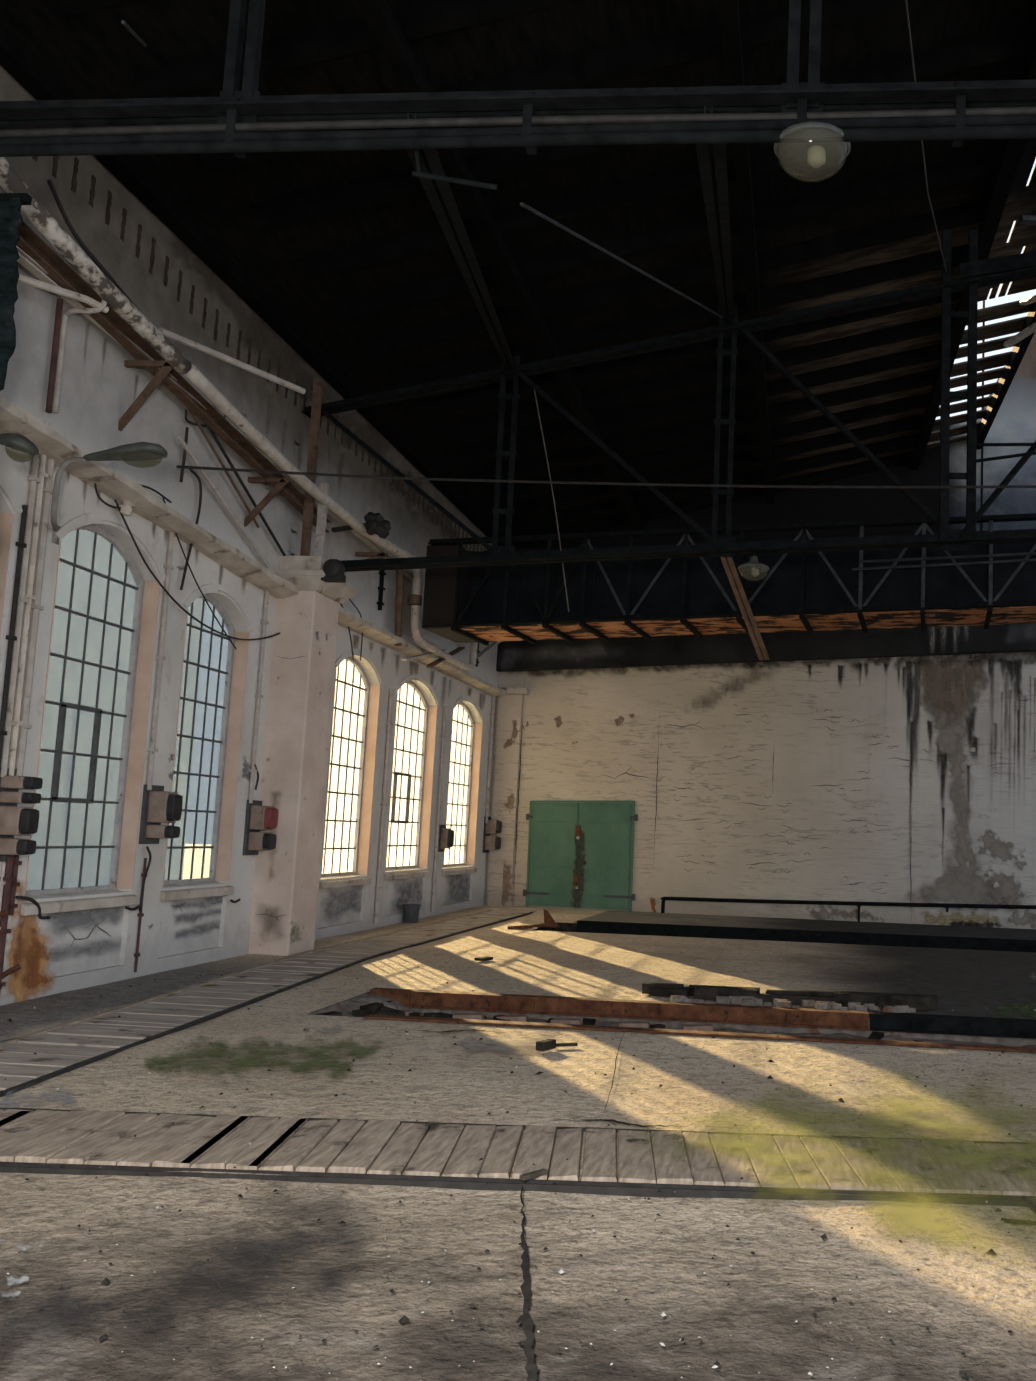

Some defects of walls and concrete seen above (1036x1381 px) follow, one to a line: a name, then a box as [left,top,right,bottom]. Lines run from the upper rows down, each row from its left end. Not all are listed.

leakage [501,625,1036,829]
spalling [534,660,1036,952]
corrosion [0,886,51,1002]
crack [516,1187,538,1381]